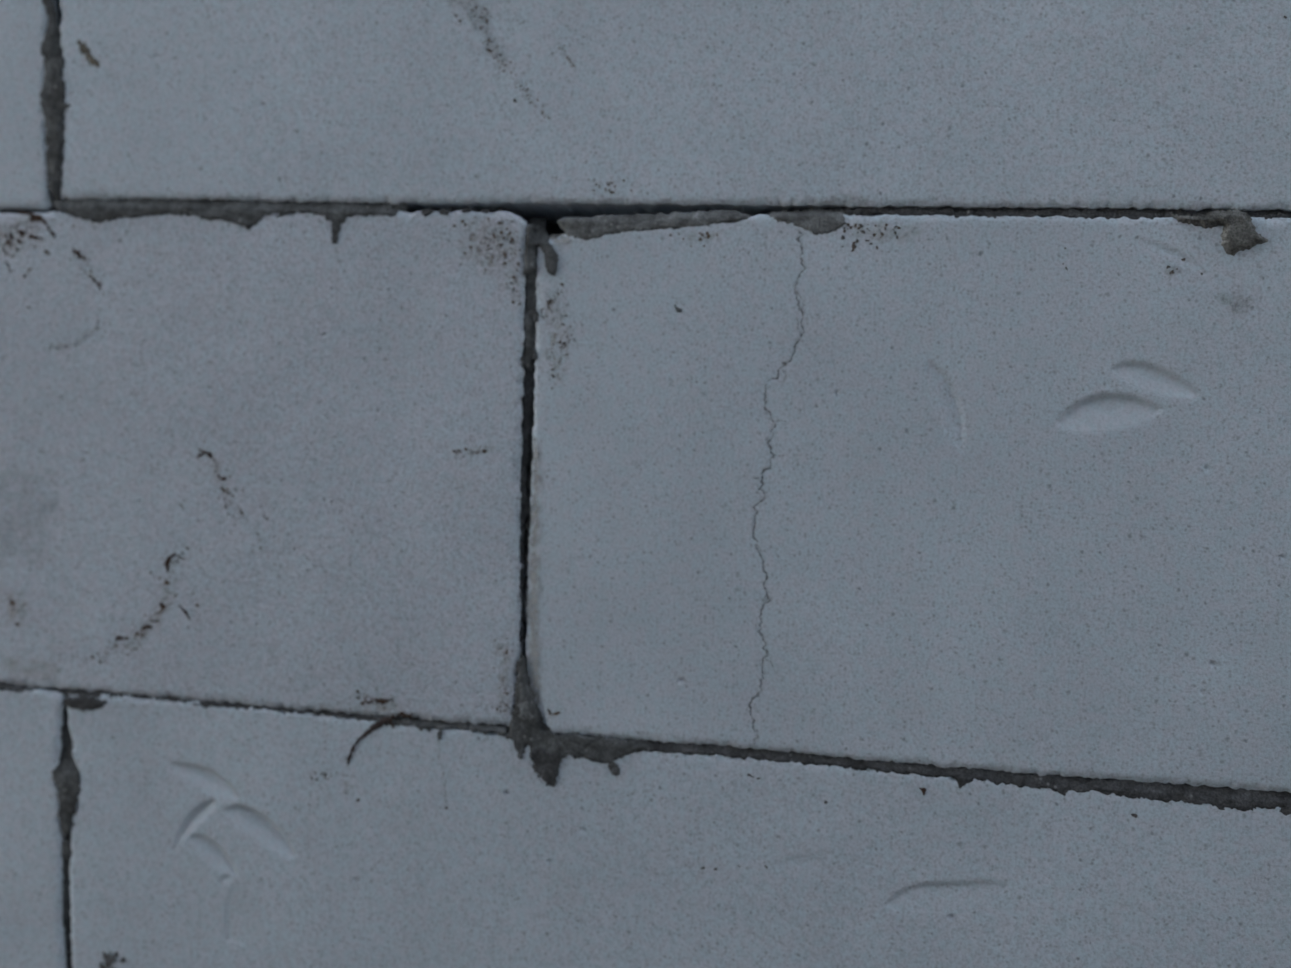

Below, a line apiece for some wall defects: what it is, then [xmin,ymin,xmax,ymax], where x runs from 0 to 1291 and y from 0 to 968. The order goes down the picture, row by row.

corrosion [76,546,199,663]
crack [749,231,805,745]